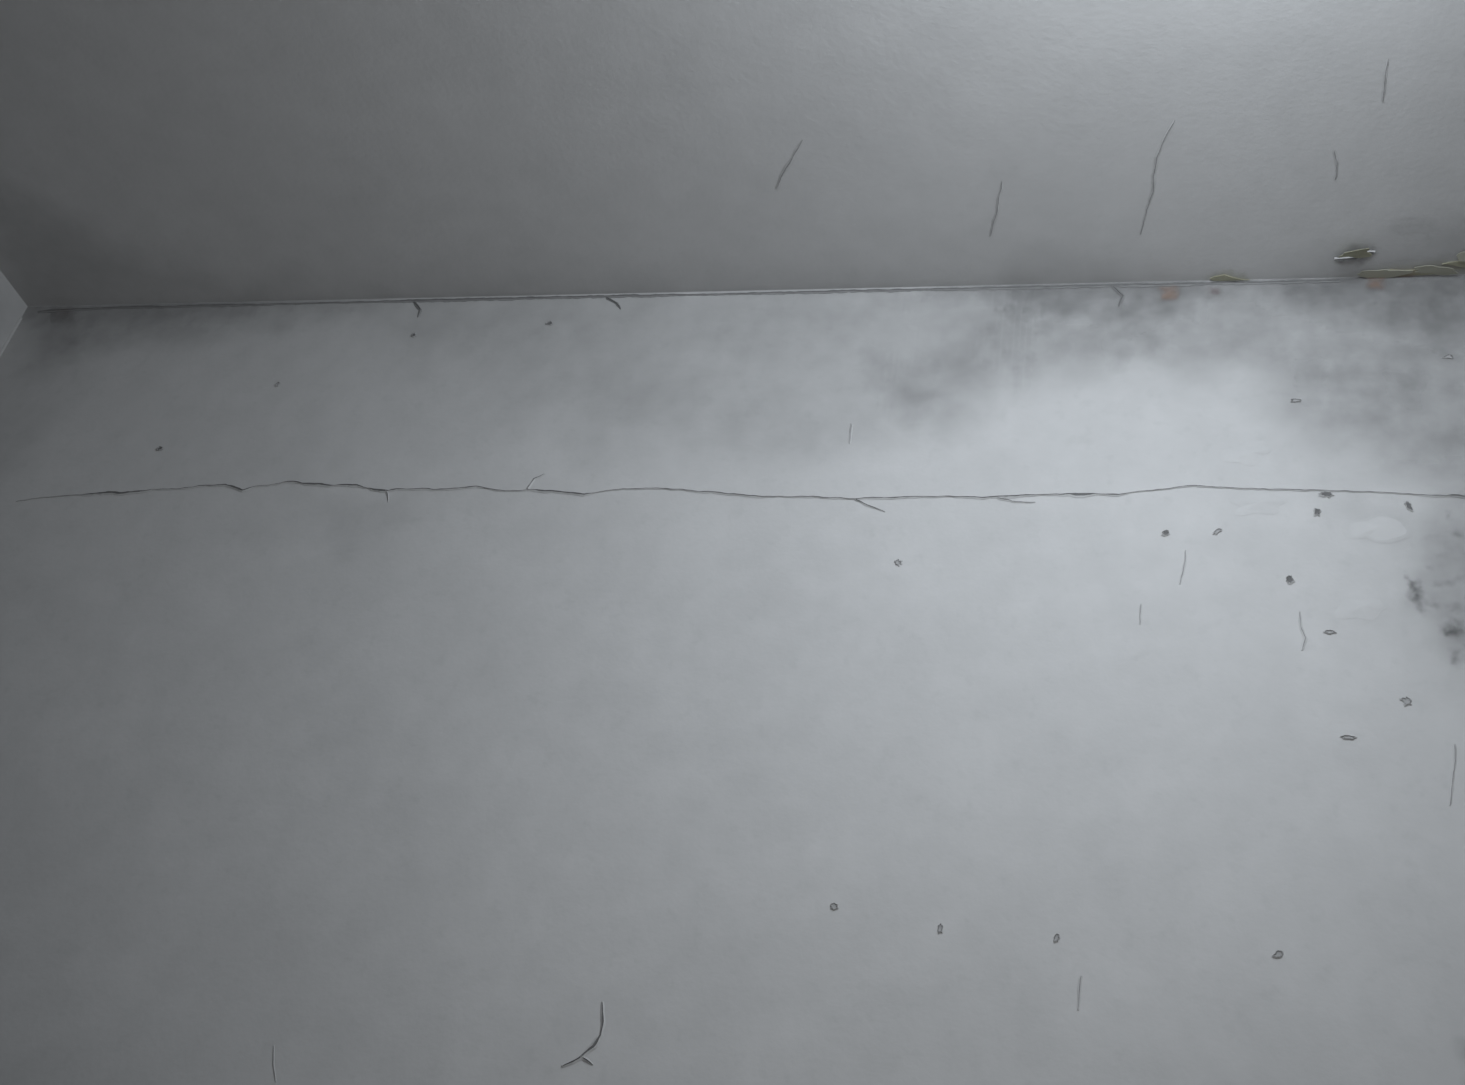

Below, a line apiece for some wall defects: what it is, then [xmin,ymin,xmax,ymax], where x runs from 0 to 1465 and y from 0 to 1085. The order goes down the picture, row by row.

crack [1140,120,1175,235]
peeling [1210,274,1250,282]
peeling [1334,248,1465,278]
crack [16,473,1465,512]
crack [1178,550,1186,585]
crack [1298,612,1308,650]
crack [561,1002,606,1068]